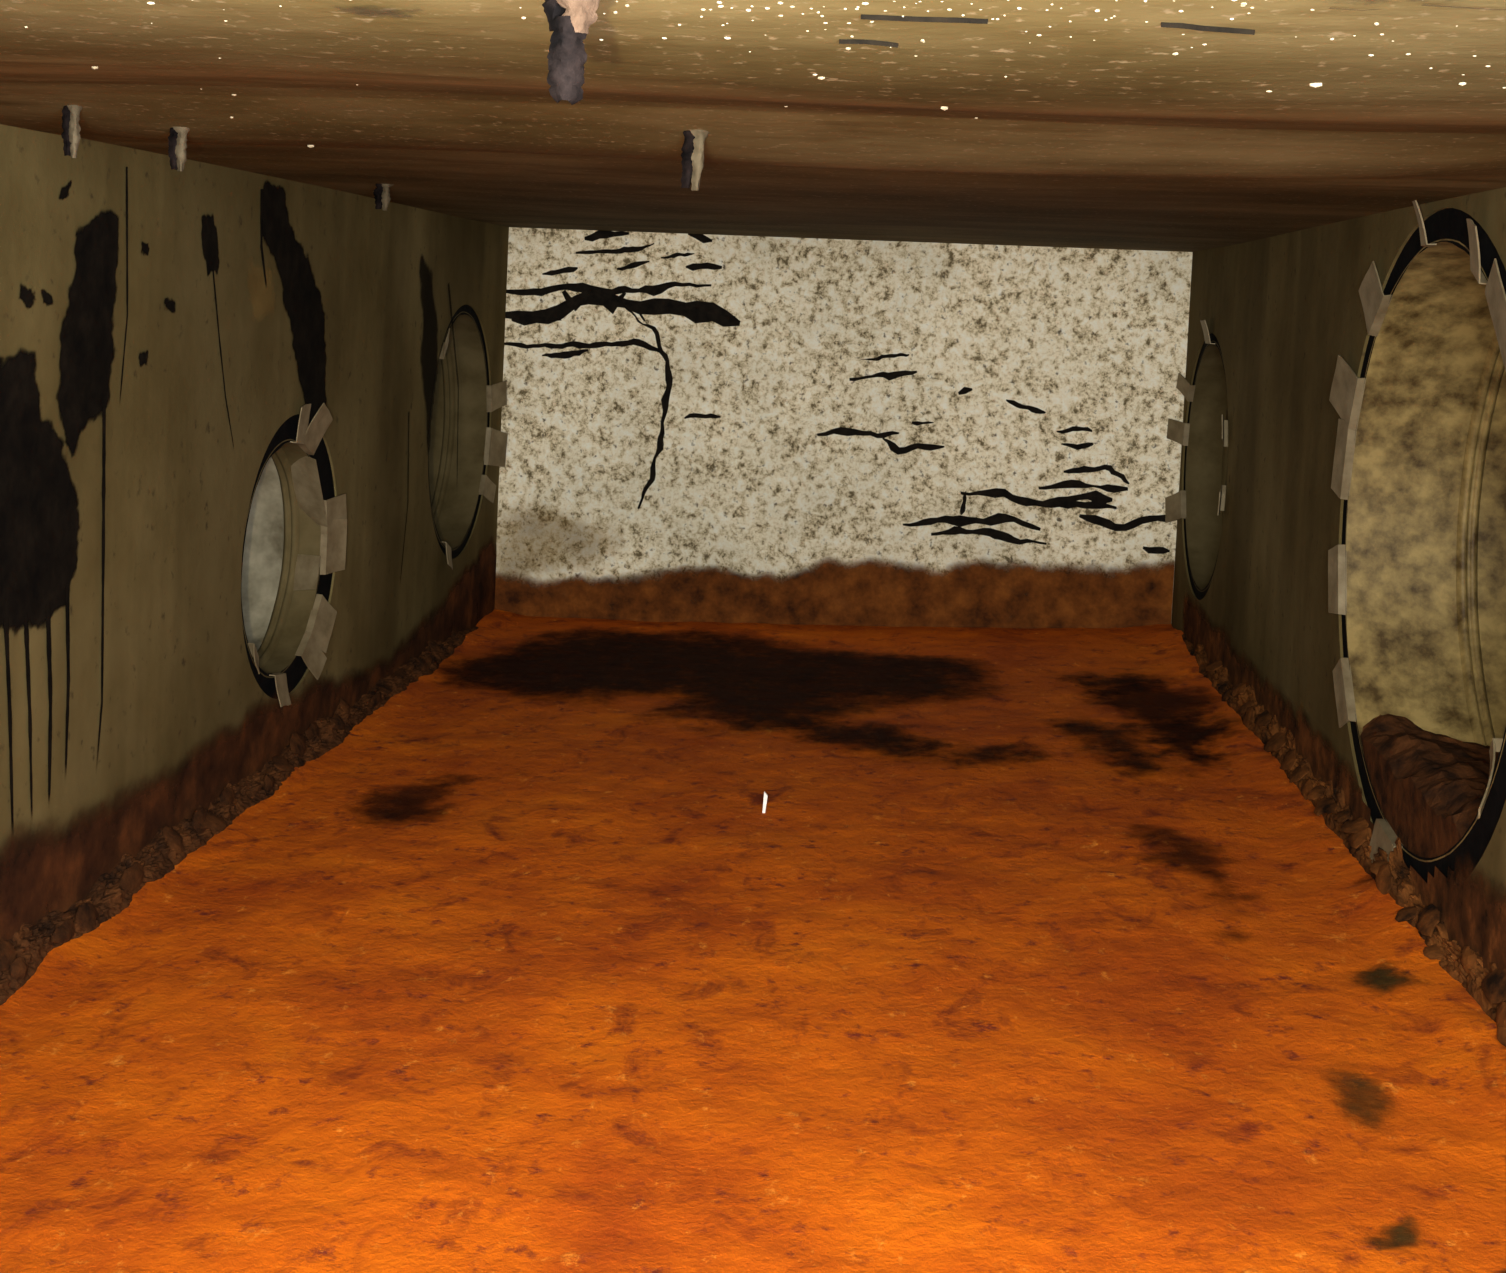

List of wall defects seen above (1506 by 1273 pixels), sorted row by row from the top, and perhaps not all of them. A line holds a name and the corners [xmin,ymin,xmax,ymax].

peeling [542,0,600,105]
leakage [0,167,149,828]
leakage [164,298,175,313]
leakage [201,215,234,447]
leakage [260,181,327,423]
crack [504,230,741,509]
crack [817,421,944,455]
crack [849,353,917,381]
crack [903,387,1170,554]